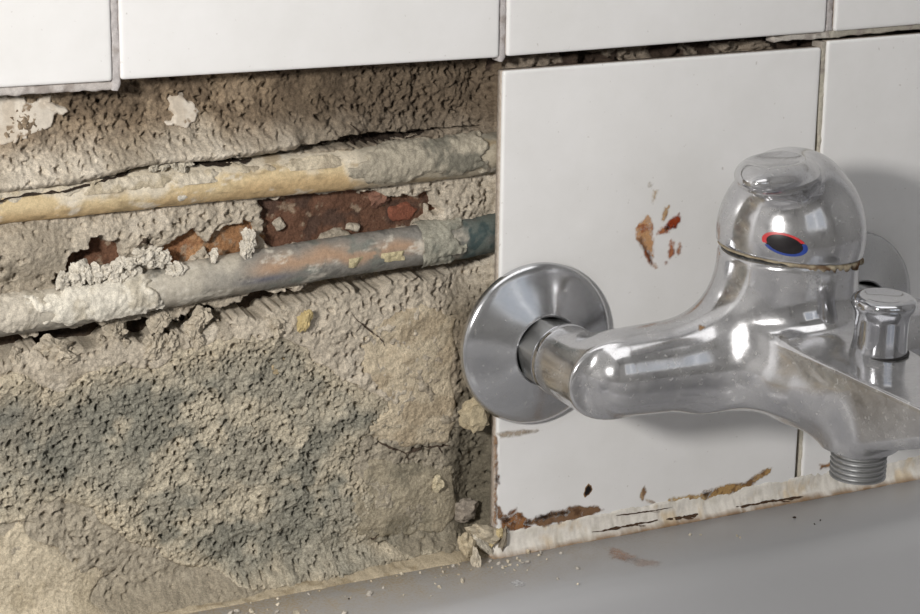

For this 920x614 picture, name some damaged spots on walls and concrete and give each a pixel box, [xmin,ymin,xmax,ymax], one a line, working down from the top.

flaking render [0,94,68,145]
flaking render [164,92,199,128]
crack [176,124,459,167]
crack [0,169,131,202]
flaking render [54,236,119,281]
flaking render [161,189,435,263]
corrosion [636,206,681,268]
spalling [0,335,439,591]
corrosion [668,468,771,501]